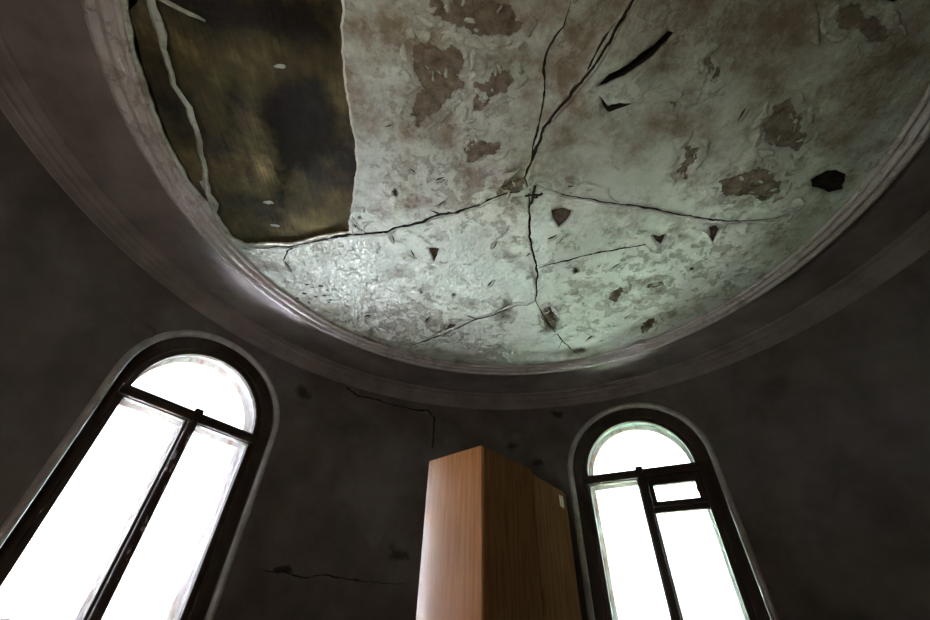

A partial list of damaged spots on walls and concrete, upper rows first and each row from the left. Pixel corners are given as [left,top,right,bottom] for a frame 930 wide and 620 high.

spalling [129,0,374,245]
crack [243,0,789,355]
spalling [811,170,845,192]
peeling [817,0,908,58]